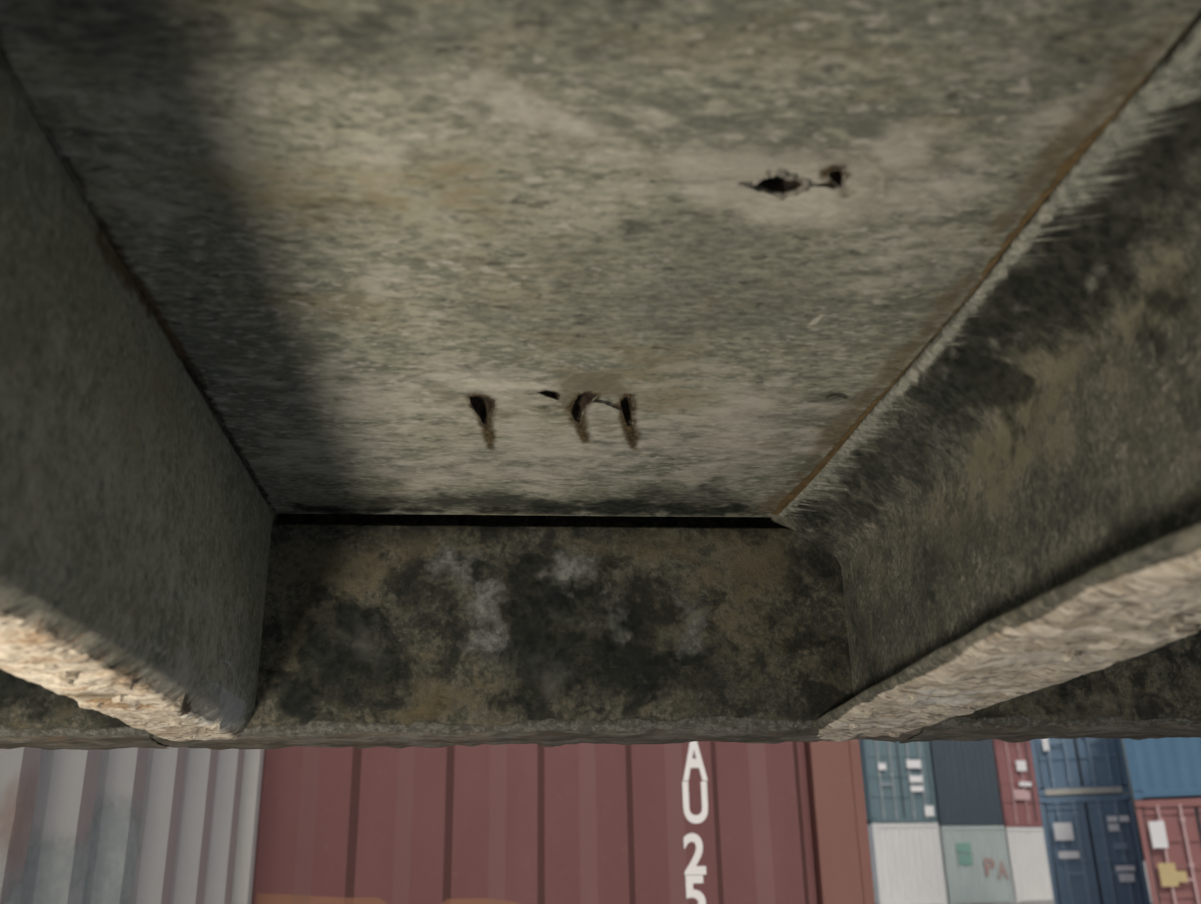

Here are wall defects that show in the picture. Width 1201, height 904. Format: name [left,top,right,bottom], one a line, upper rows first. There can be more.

water stain [701,154,885,227]
spalling [740,166,848,201]
water stain [780,11,1201,533]
corrosion [479,416,494,449]
corrosion [567,402,587,442]
corrosion [617,395,637,448]
water stain [280,601,401,710]
water stain [495,559,665,688]